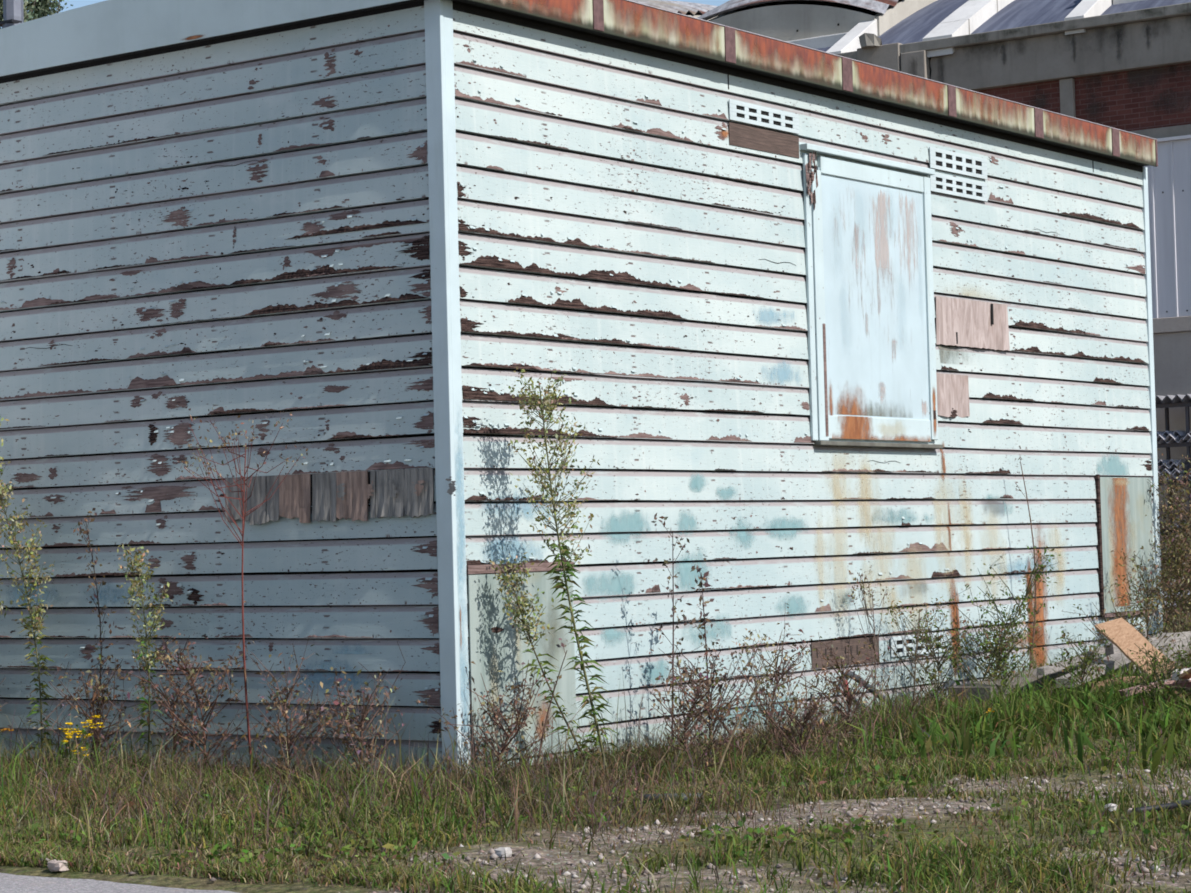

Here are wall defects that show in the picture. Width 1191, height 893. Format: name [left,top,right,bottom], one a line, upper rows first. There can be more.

rust [609,0,719,43]
rust [737,30,839,73]
rust [854,61,945,104]
peeling [614,109,799,172]
rust [1045,111,1153,152]
peeling [935,290,1021,358]
peeling [463,352,760,409]
peeling [794,324,829,443]
peeling [0,179,439,672]
rust [830,388,892,440]
rust [1113,478,1129,607]
peeling [792,629,928,671]